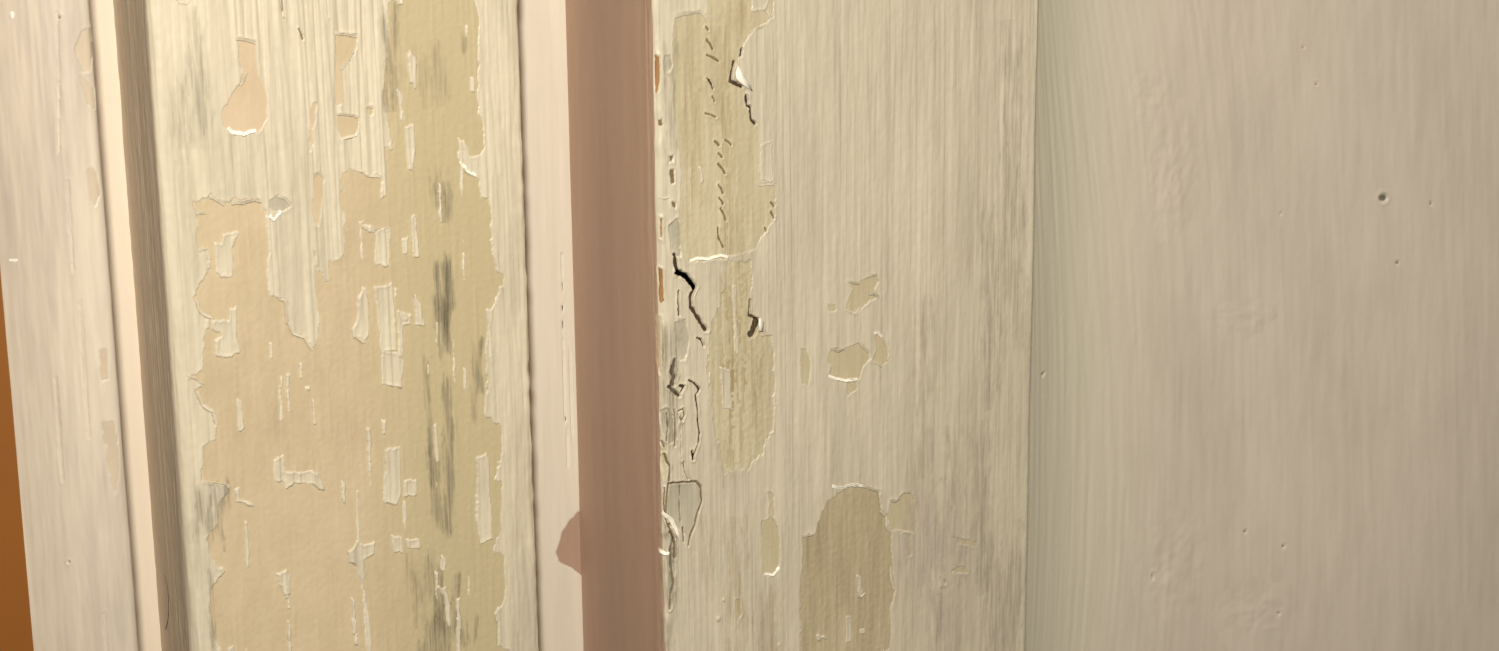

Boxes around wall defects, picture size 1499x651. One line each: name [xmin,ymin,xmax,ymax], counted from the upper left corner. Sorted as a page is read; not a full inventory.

peeling [186,0,508,651]
peeling [654,0,776,474]
peeling [828,332,890,382]
peeling [846,273,880,314]
peeling [658,408,701,608]
peeling [761,517,780,576]
peeling [800,483,915,651]